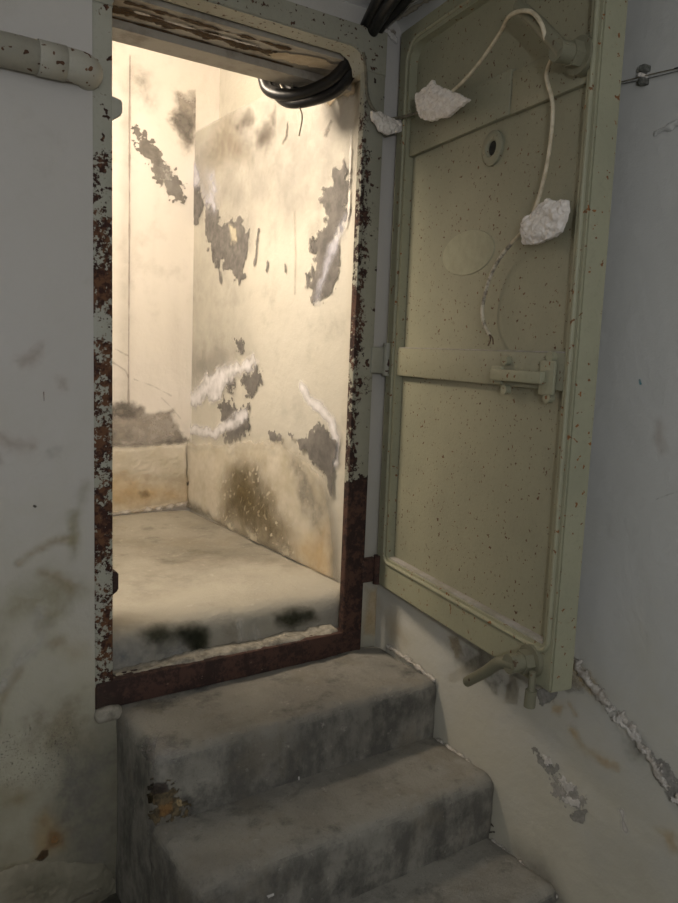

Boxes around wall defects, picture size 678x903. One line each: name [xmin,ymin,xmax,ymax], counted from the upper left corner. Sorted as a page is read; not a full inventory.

peeling [131,124,269,285]
peeling [305,159,352,305]
peeling [217,364,263,445]
damp [227,472,282,542]
damp [146,626,206,650]
damp [277,610,313,627]
spalling [573,658,678,805]
spalling [147,778,191,825]
peeling [532,747,587,824]